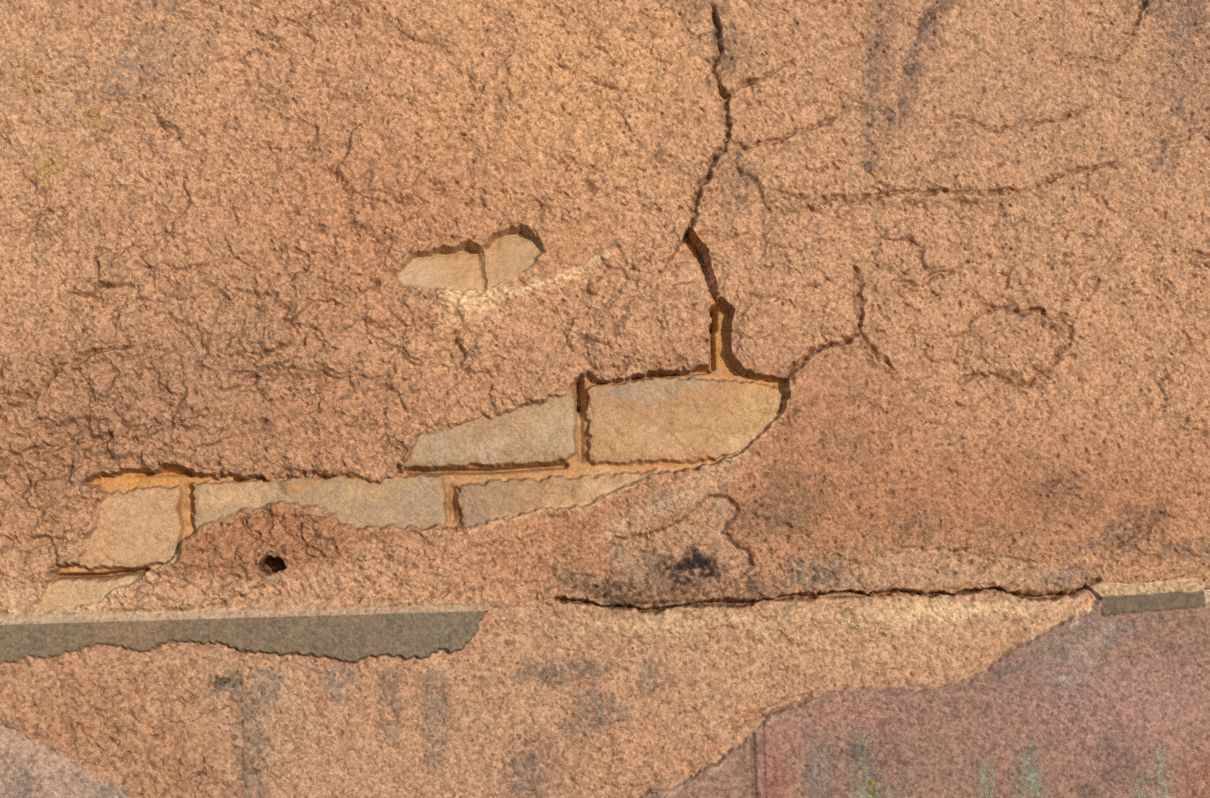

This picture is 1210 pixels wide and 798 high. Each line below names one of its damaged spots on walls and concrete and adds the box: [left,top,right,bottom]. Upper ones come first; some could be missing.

crack [1046,0,1151,65]
crack [683,3,847,237]
crack [936,103,1099,137]
crack [763,159,1121,207]
crack [1185,247,1210,259]
crack [0,340,140,402]
crack [782,259,903,385]
crack [950,302,1077,391]
spalling [31,231,789,611]
spalling [0,494,1101,798]